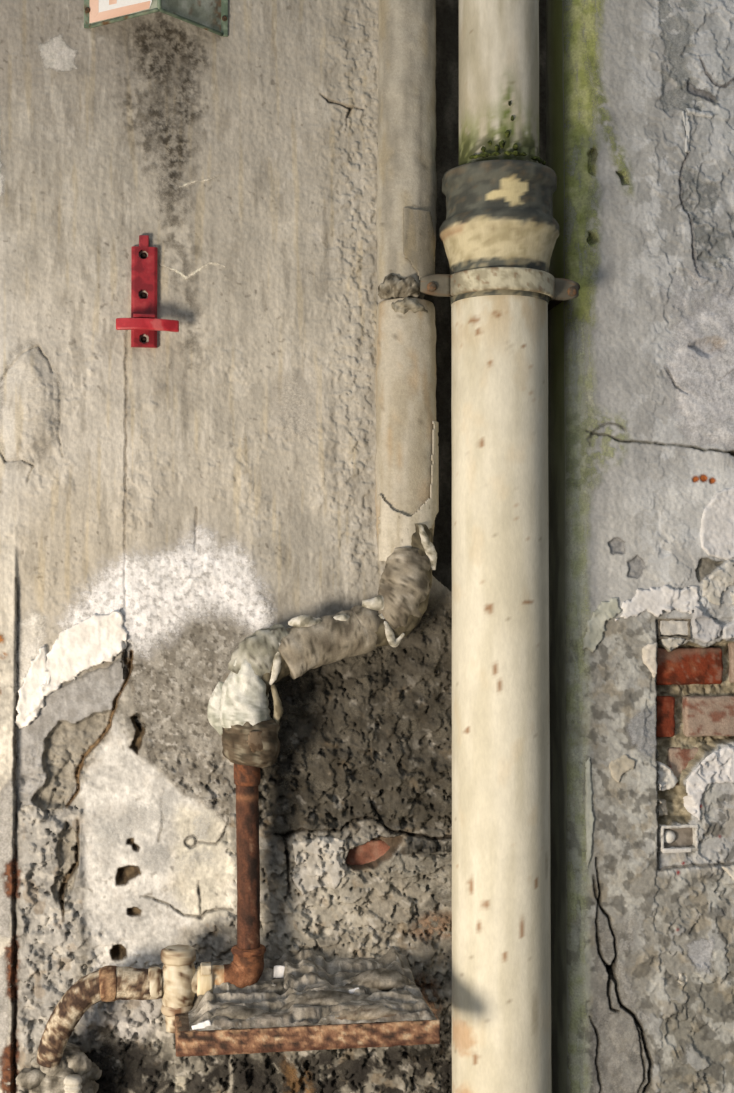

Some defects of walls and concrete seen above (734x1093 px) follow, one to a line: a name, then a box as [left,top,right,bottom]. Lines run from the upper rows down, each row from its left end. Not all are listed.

mould [125,16,205,196]
crack [679,112,698,272]
crack [586,423,731,453]
efflorescence [58,528,273,654]
leakage [563,0,630,1093]
spalling [582,487,734,827]
spalling [0,596,248,938]
corrosion [4,858,21,898]
peeling [292,836,452,897]
corrosion [4,936,19,1000]
crack [589,857,653,1093]
corrosion [0,1038,19,1093]